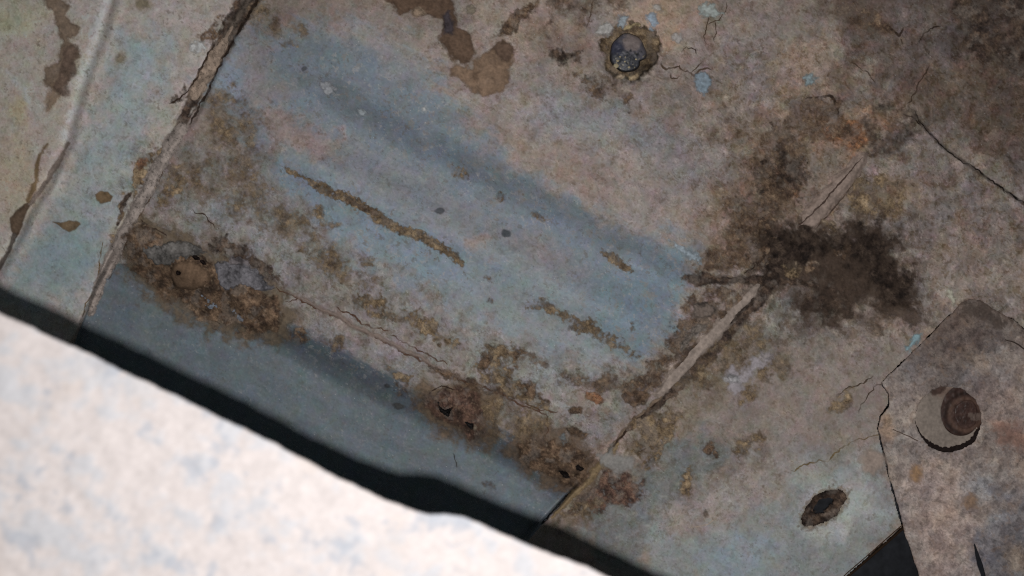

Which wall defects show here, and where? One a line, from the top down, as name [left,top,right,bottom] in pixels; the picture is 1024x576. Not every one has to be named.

corrosion [545,21,633,103]
crack [910,68,1018,200]
corrosion [208,234,279,281]
corrosion [274,205,460,348]
corrosion [560,97,922,520]
damp [748,214,929,327]
crack [277,288,556,434]
corrosion [429,344,550,410]
crack [840,378,874,401]
crack [794,435,877,472]
corrosion [801,489,846,526]